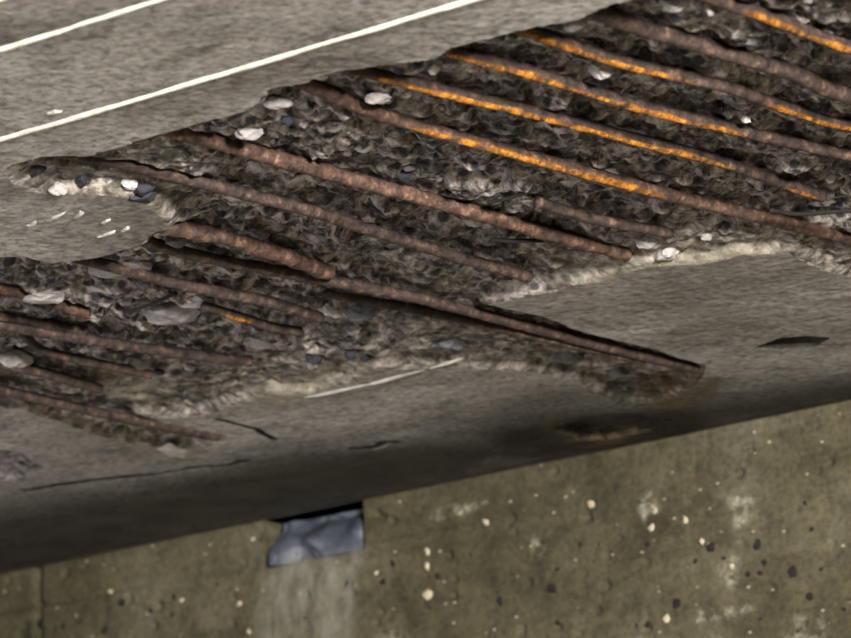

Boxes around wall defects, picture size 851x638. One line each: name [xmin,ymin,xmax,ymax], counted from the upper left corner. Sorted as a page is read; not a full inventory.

spalling [0,0,851,459]
spalling [0,448,45,481]